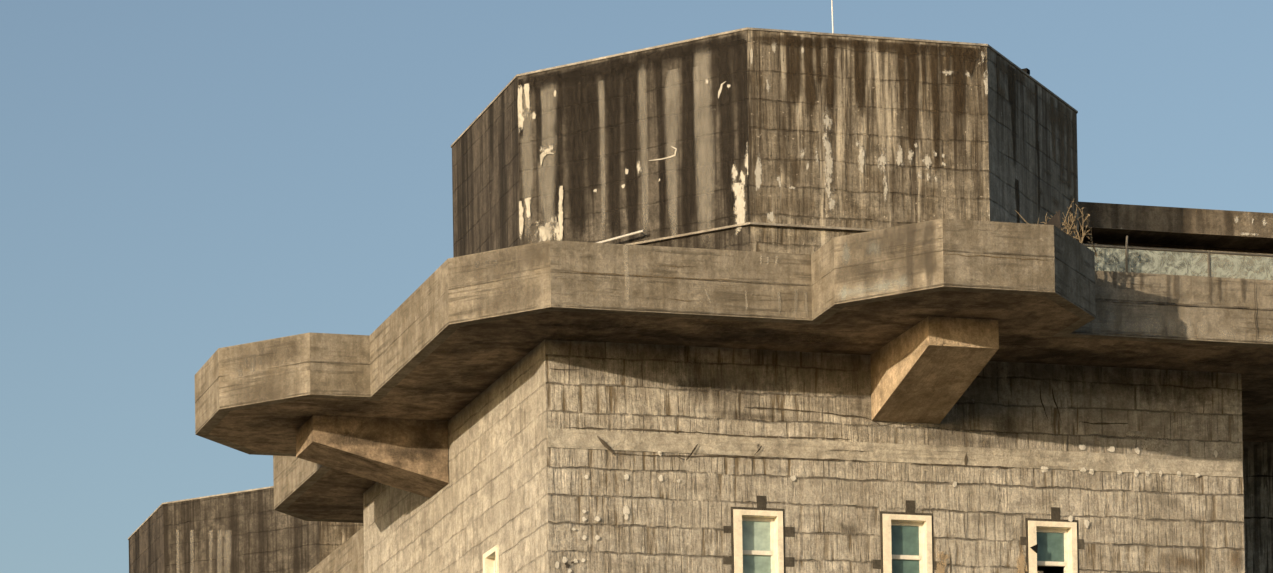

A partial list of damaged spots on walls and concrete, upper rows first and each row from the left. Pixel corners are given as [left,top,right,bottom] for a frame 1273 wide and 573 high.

peeling [518,83,536,132]
leakage [518,35,979,236]
peeling [519,186,564,242]